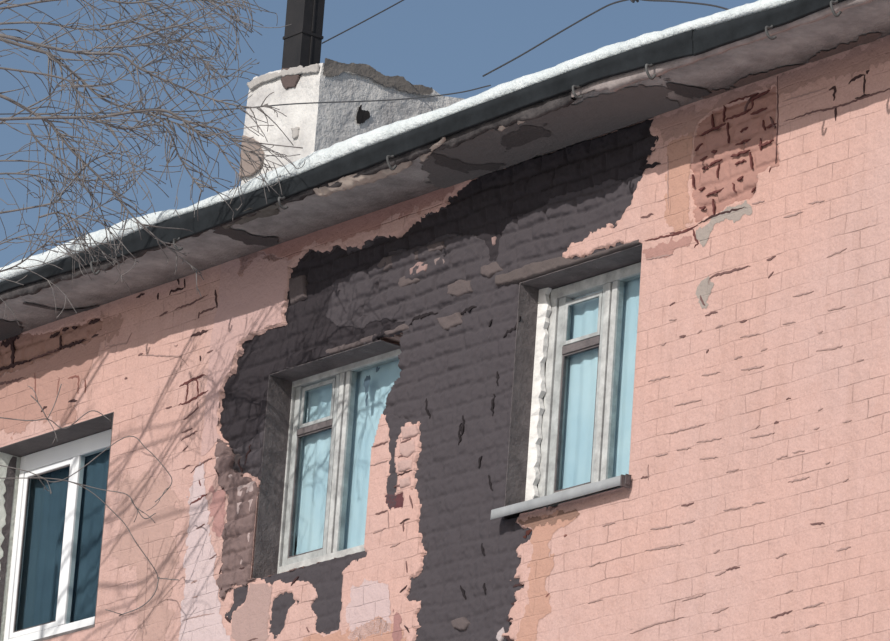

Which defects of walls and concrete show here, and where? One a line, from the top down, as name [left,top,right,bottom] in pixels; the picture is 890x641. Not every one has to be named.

spalling [281,68,300,89]
spalling [356,105,370,124]
crack [775,76,890,164]
spalling [690,87,780,248]
spalling [0,318,103,376]
spalling [178,119,659,641]